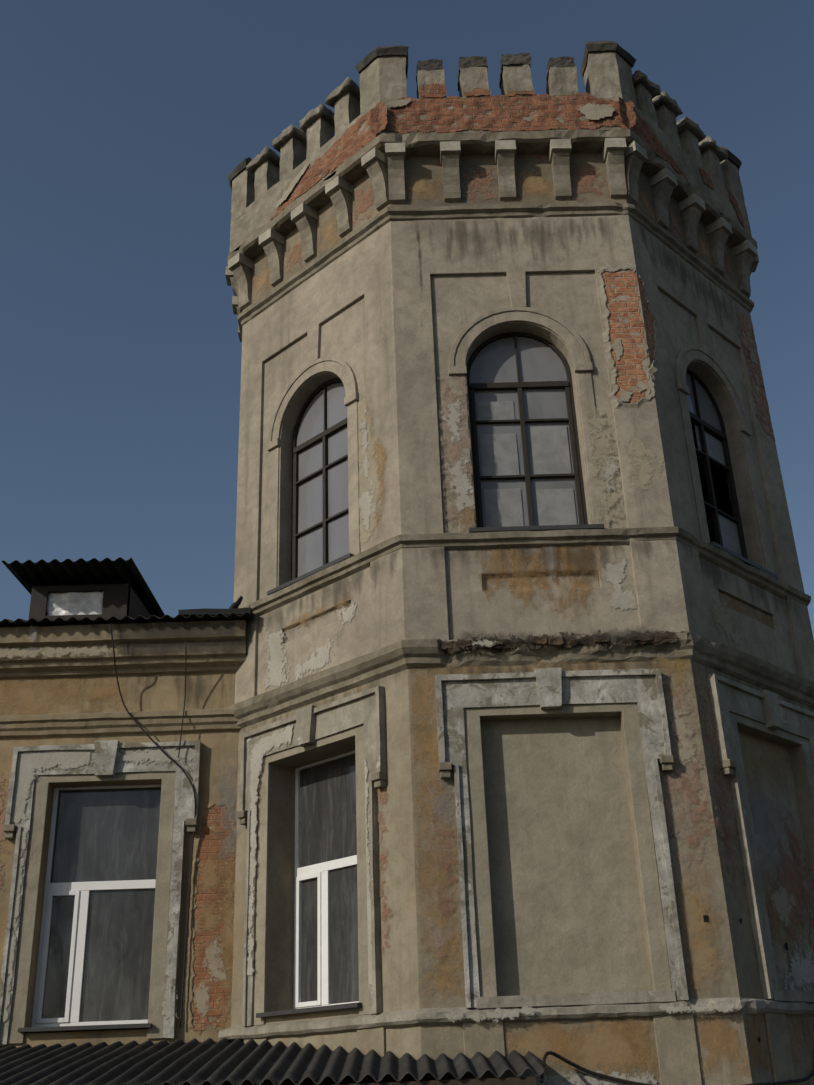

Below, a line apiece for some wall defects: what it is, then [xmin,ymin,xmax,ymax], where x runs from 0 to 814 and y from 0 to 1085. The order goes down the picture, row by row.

flaking render [270,83,714,220]
flaking render [439,377,476,527]
flaking render [588,264,659,526]
flaking render [736,307,775,439]
spalling [444,639,503,652]
spalling [531,635,610,649]
peeling [603,558,638,611]
peeling [118,746,195,765]
flaking render [161,798,237,1035]
peeling [247,725,293,975]